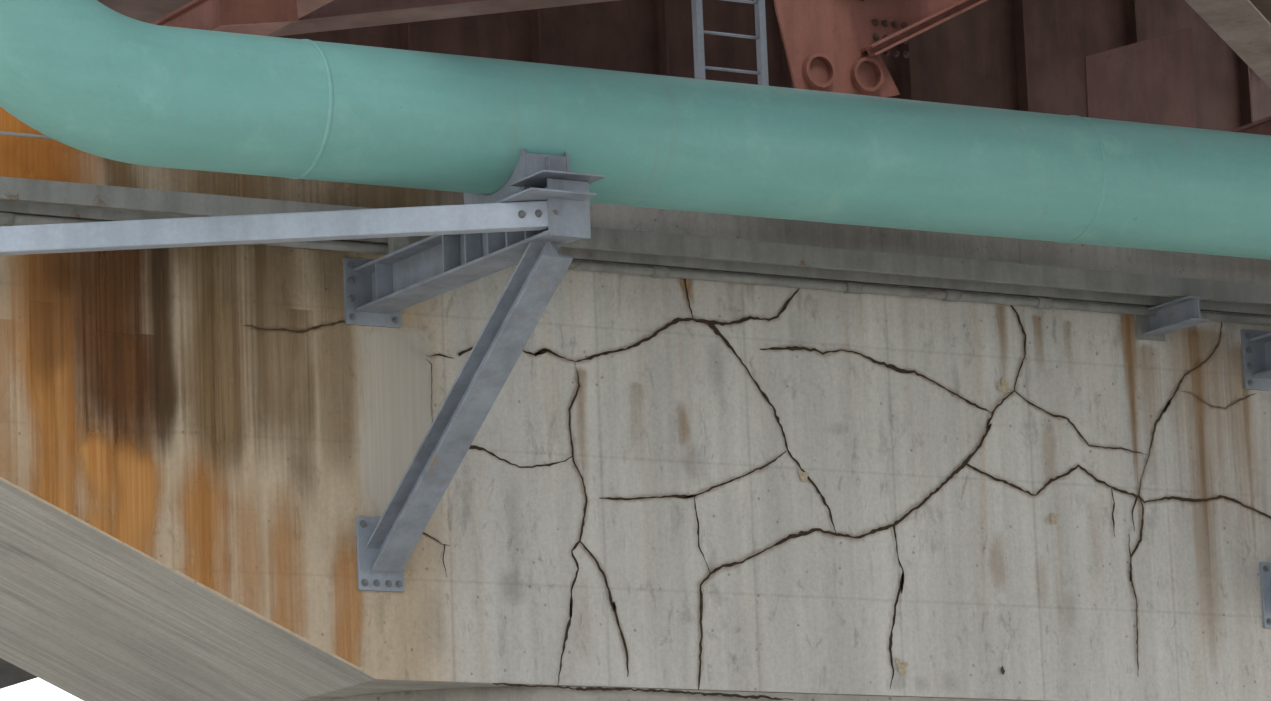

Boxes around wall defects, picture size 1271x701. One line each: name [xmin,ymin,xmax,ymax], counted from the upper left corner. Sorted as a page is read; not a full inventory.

corrosion [0,107,73,182]
corrosion [13,249,160,557]
crack [244,320,345,333]
crack [403,334,473,424]
corrosion [1121,314,1135,424]
corrosion [183,467,227,592]
corrosion [337,553,359,665]
crack [423,532,450,577]
crack [469,279,1271,700]